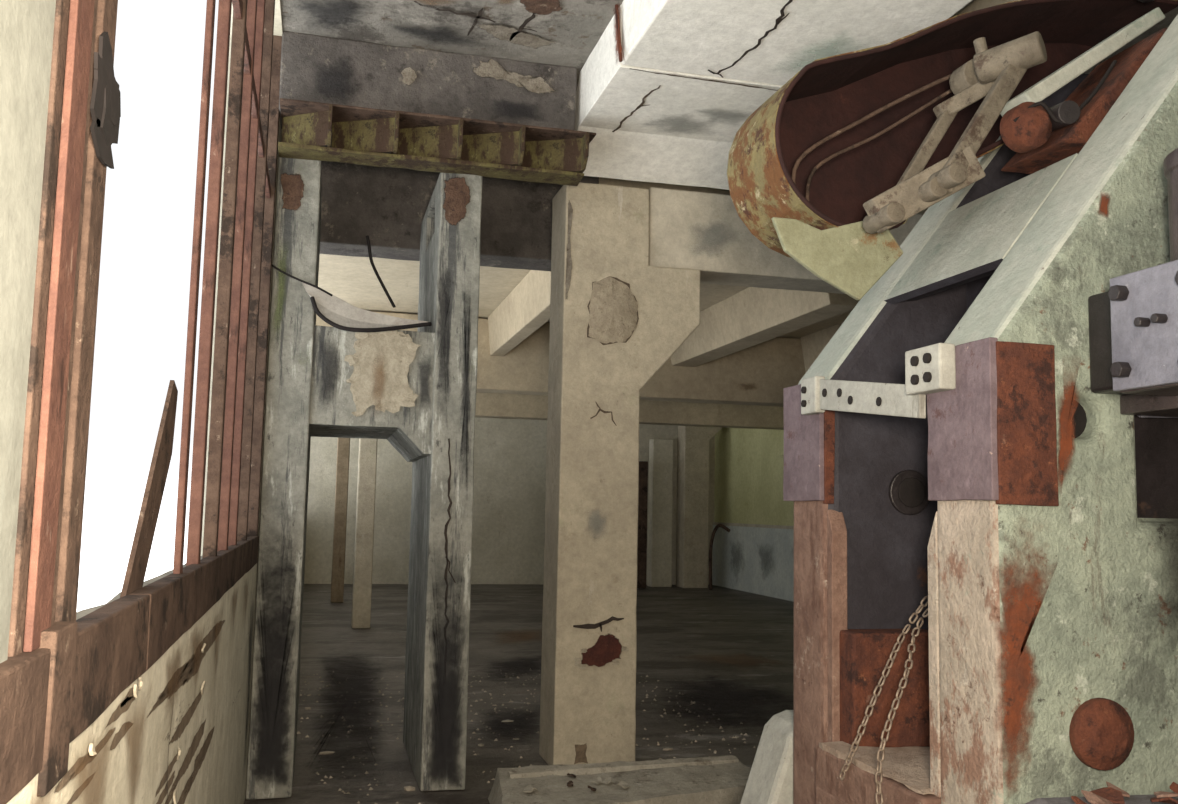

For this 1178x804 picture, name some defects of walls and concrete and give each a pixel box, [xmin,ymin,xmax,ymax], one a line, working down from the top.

crack [414,1,537,41]
spalling [473,59,556,94]
rust [613,4,624,62]
crack [612,0,793,132]
peeling [344,330,421,417]
crack [444,438,456,637]
leakage [245,565,293,779]
leakage [431,583,460,781]
crack [573,616,624,632]
spalling [574,633,629,669]